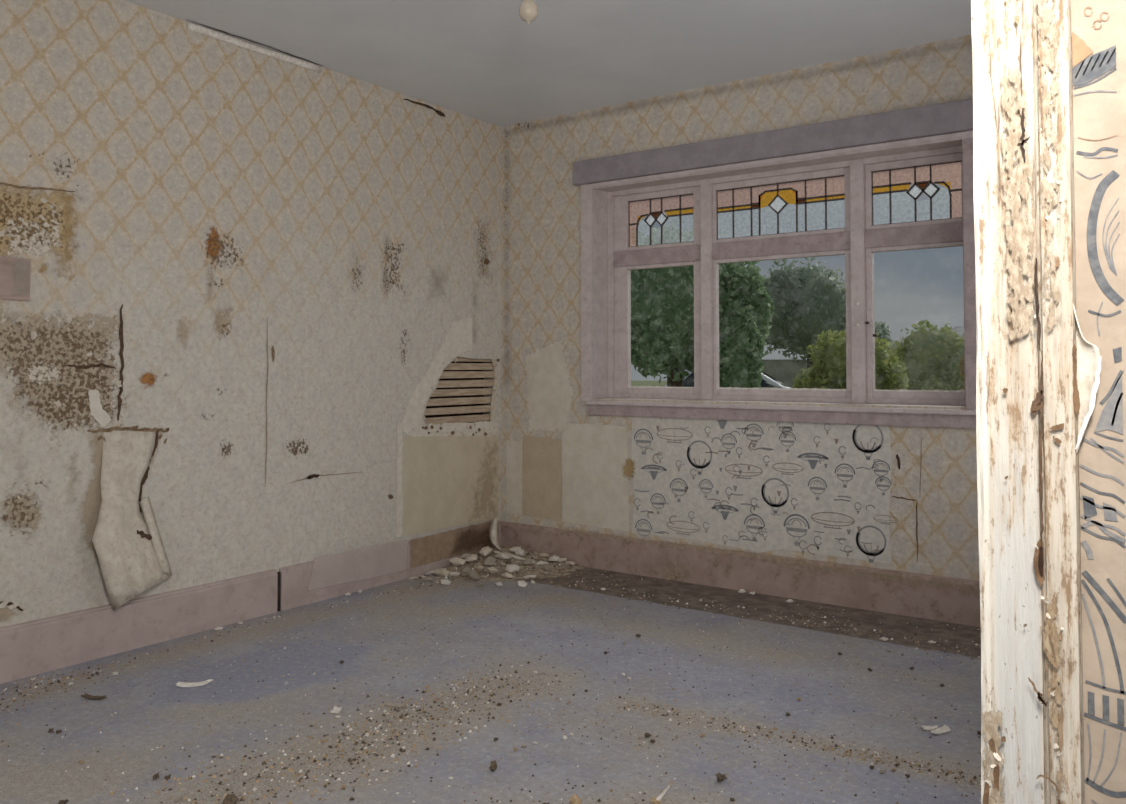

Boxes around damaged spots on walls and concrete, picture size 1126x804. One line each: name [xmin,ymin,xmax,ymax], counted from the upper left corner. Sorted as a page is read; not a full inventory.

flaking render [0,185,75,265]
flaking render [0,309,127,554]
crack [116,304,124,421]
rust [206,227,243,287]
flaking render [402,357,500,568]
spalling [1000,0,1062,340]
spalling [981,711,1006,804]
peeling [1028,540,1065,804]